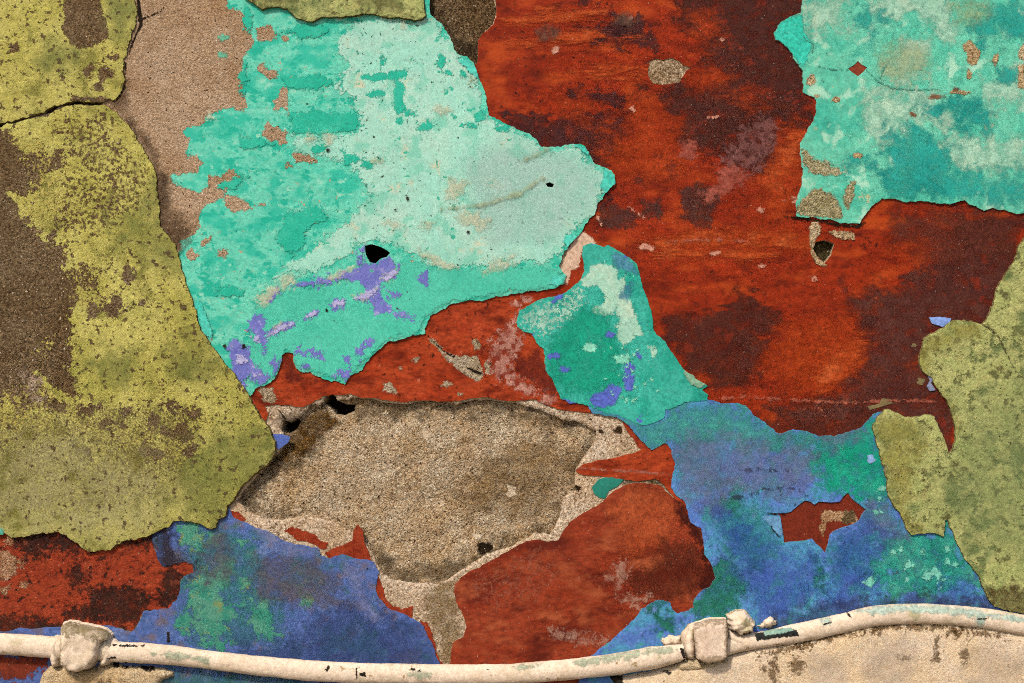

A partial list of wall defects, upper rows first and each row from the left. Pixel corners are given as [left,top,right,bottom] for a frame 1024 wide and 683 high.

crack [0,0,164,127]
flaking render [818,510,845,534]
peeling [536,669,653,683]